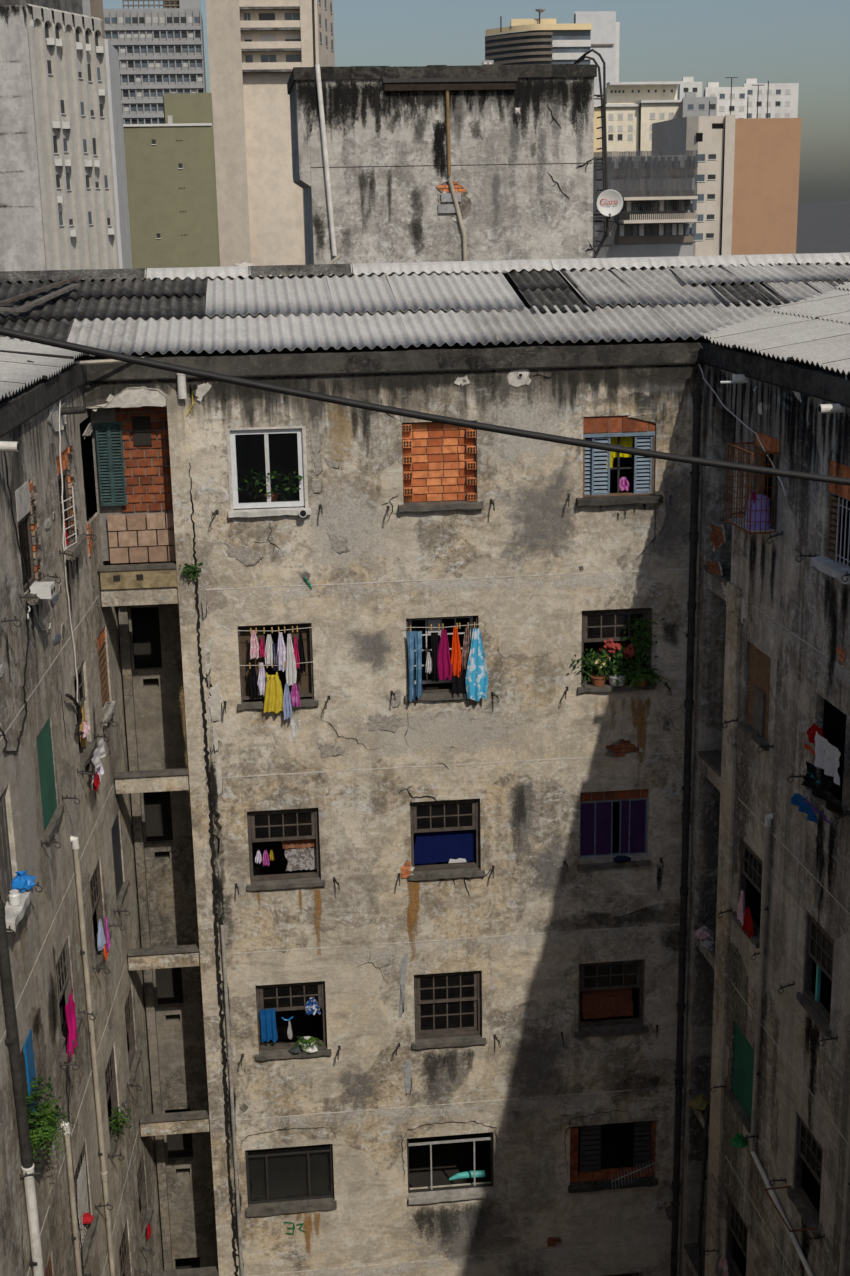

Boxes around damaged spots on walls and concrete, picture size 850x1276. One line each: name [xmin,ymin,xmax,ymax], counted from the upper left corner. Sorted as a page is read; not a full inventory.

water stain [297,77,592,194]
water stain [314,218,324,255]
water stain [360,170,392,224]
water stain [412,191,423,254]
spalling [82,386,168,439]
water stain [540,365,850,502]
spalling [604,737,643,757]
corrosion [631,699,650,762]
crack [189,463,325,1276]
corrosion [299,887,321,954]
corrosion [407,880,420,950]
water stain [341,1047,479,1121]